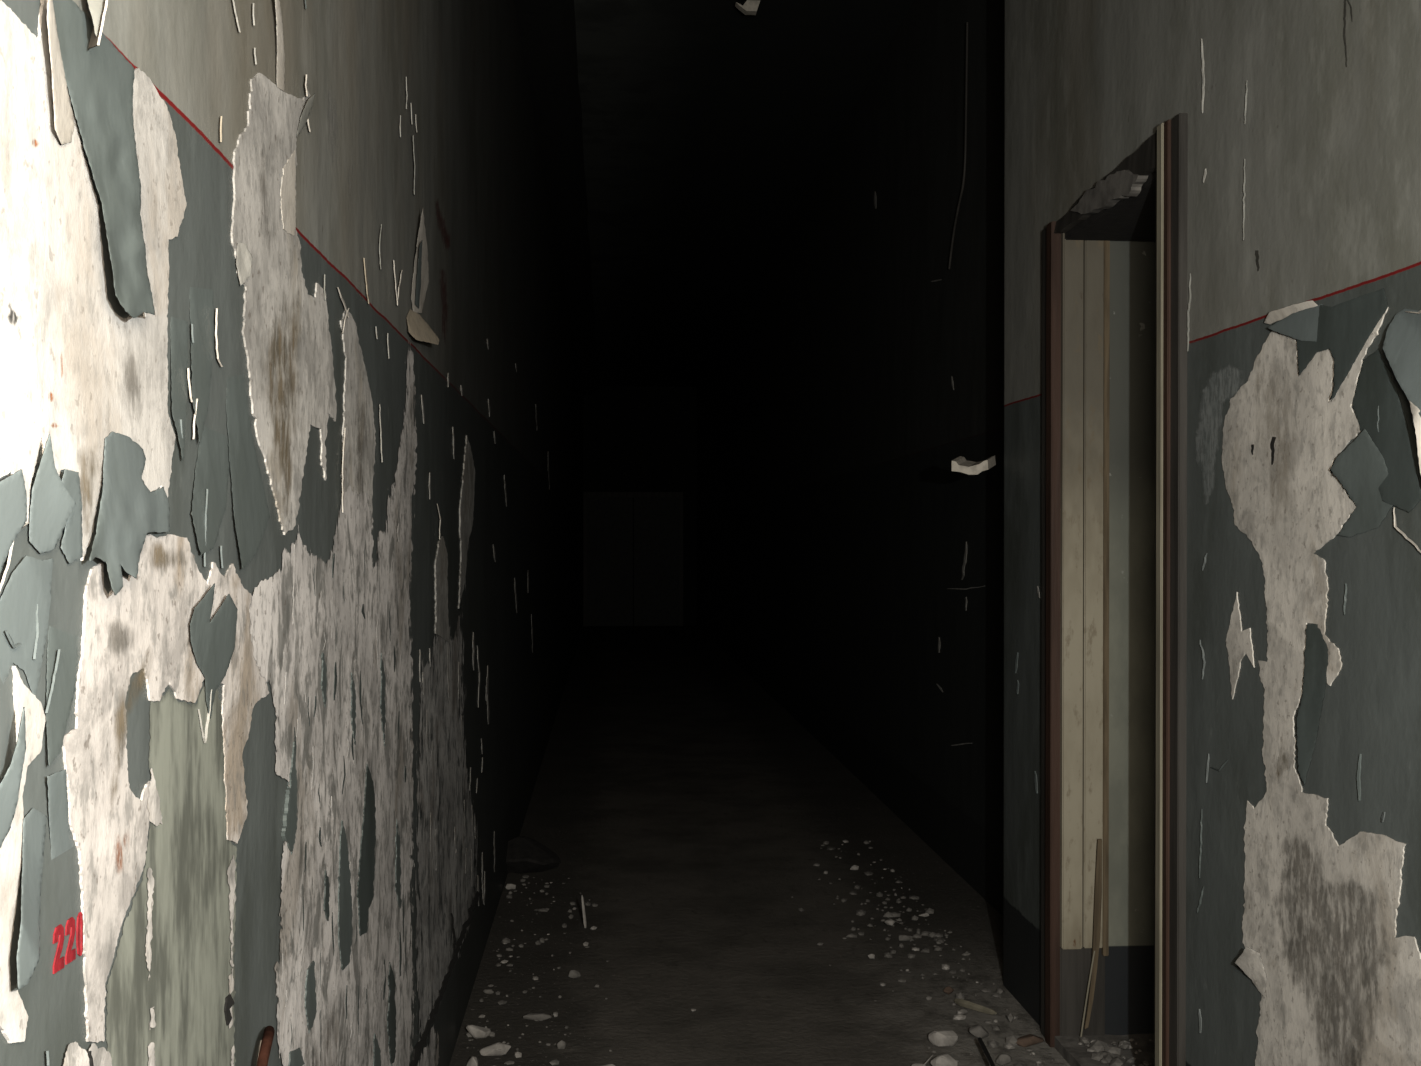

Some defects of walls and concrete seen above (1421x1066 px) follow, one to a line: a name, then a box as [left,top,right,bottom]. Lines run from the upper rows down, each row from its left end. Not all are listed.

crack [1343,0,1353,67]
peeling [0,0,496,1066]
peeling [1222,288,1421,1066]